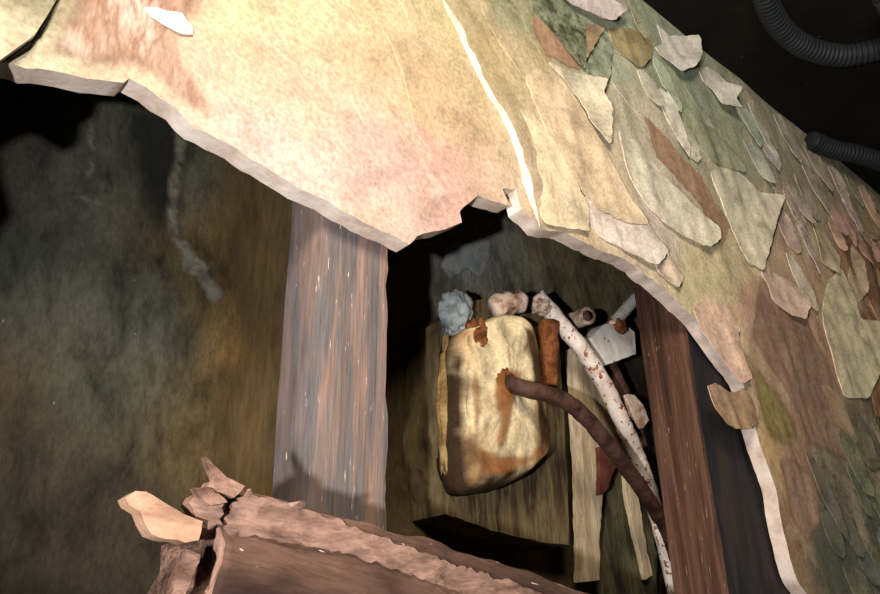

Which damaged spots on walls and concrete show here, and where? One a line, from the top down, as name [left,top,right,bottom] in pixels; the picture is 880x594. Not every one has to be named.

crack [6,0,56,60]
water stain [134,113,222,303]
peeling [516,0,880,594]
rust [525,328,542,384]
rust [479,370,547,474]
rust [623,394,649,429]